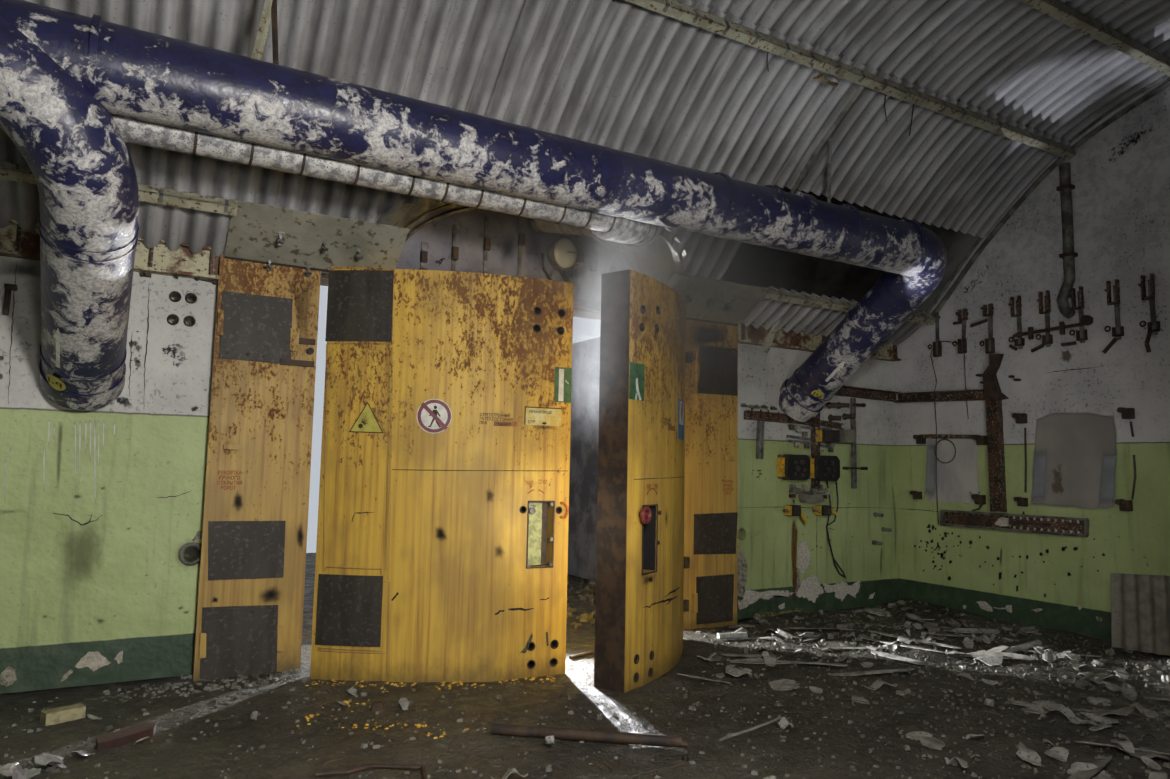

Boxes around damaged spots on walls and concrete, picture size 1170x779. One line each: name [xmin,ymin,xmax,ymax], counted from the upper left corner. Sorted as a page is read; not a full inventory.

crack [54,513,102,526]
peeling [737,528,875,611]
peeling [61,651,123,682]